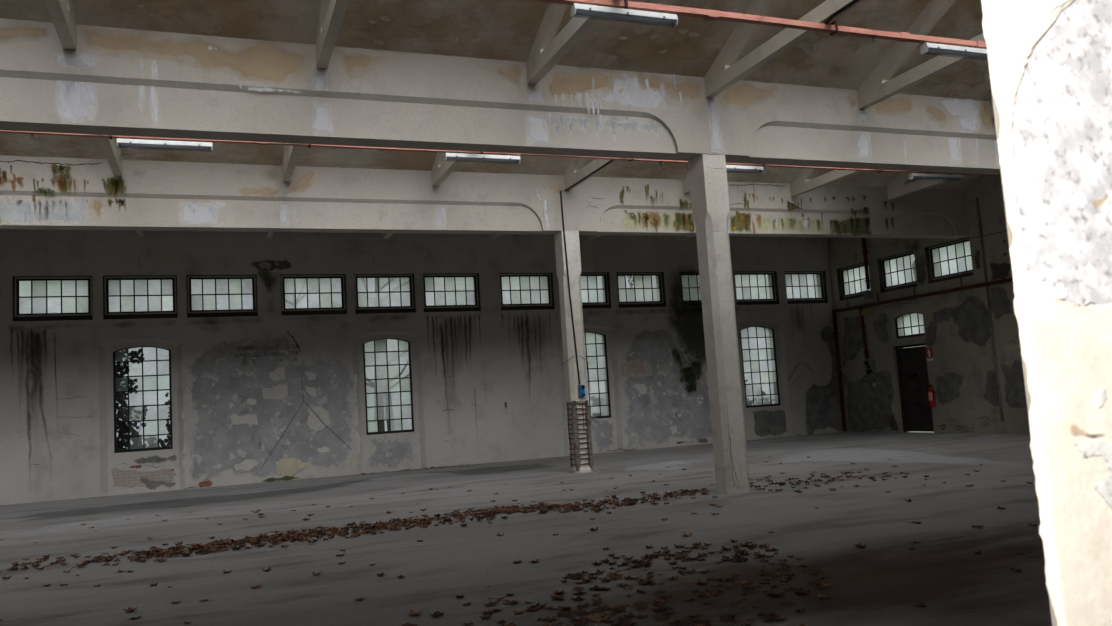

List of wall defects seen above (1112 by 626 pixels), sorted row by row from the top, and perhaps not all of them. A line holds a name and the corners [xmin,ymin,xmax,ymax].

damp [60,80,94,118]
damp [90,34,299,121]
peeling [554,73,687,122]
damp [620,185,694,231]
damp [731,192,869,235]
flaking render [925,0,1112,347]
flaking render [112,338,351,489]
spalling [566,400,612,471]
flaking render [622,330,712,445]
flaking render [806,327,843,435]
flaking render [936,360,1027,432]